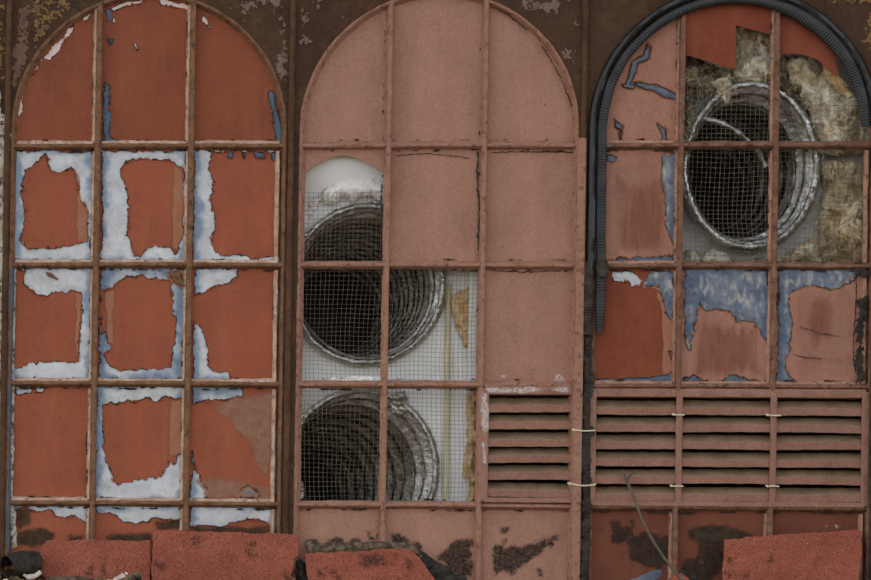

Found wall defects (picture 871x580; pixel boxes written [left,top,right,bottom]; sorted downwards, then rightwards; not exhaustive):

peeling [0,0,91,88]
peeling [105,0,146,48]
peeling [157,0,188,11]
peeling [621,42,676,100]
peeling [614,118,625,140]
peeling [656,122,667,140]
peeling [0,93,11,374]
peeling [608,152,870,385]
peeling [14,80,281,533]
damp [492,527,559,575]
damp [611,520,669,569]
damp [682,525,751,580]